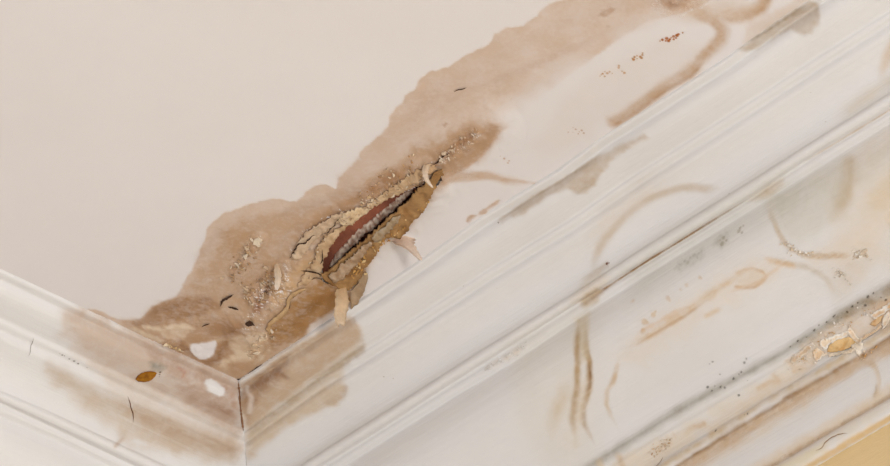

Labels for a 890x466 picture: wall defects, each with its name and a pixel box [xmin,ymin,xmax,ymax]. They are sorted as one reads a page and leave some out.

spalling [290,128,479,327]
spalling [219,237,285,306]
crack [220,288,306,334]
spalling [788,301,890,370]
corrosion [136,371,157,382]
crack [237,358,272,431]